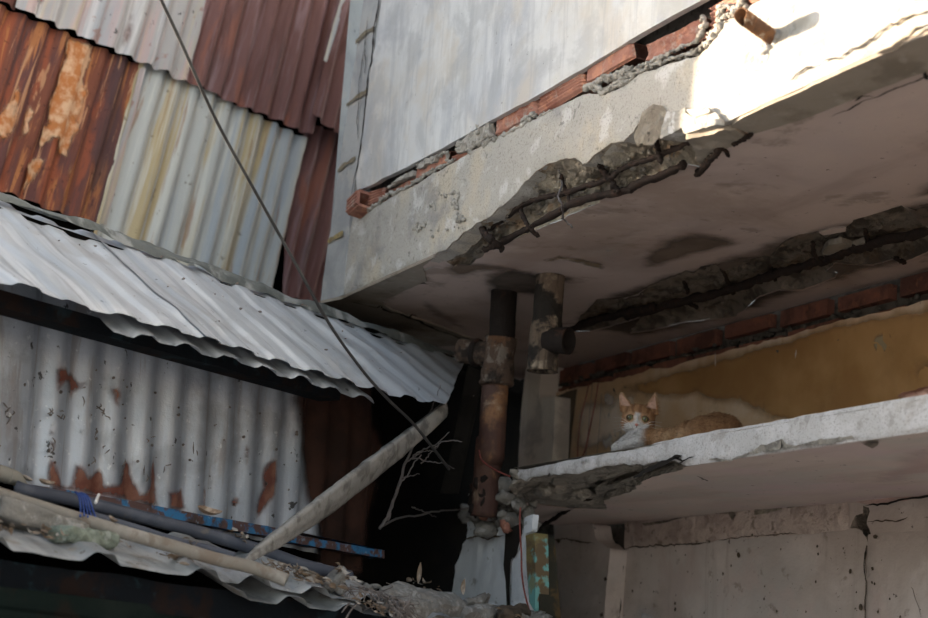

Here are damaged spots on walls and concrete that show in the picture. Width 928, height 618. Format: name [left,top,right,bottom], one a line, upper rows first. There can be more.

crack [790,11,928,81]
crack [351,0,379,194]
spalling [435,104,754,265]
spalling [571,204,928,332]
rust [58,368,79,395]
rust [49,462,156,504]
rust [170,489,184,509]
rust [257,461,277,514]
spalling [509,455,693,509]
crack [867,495,928,522]